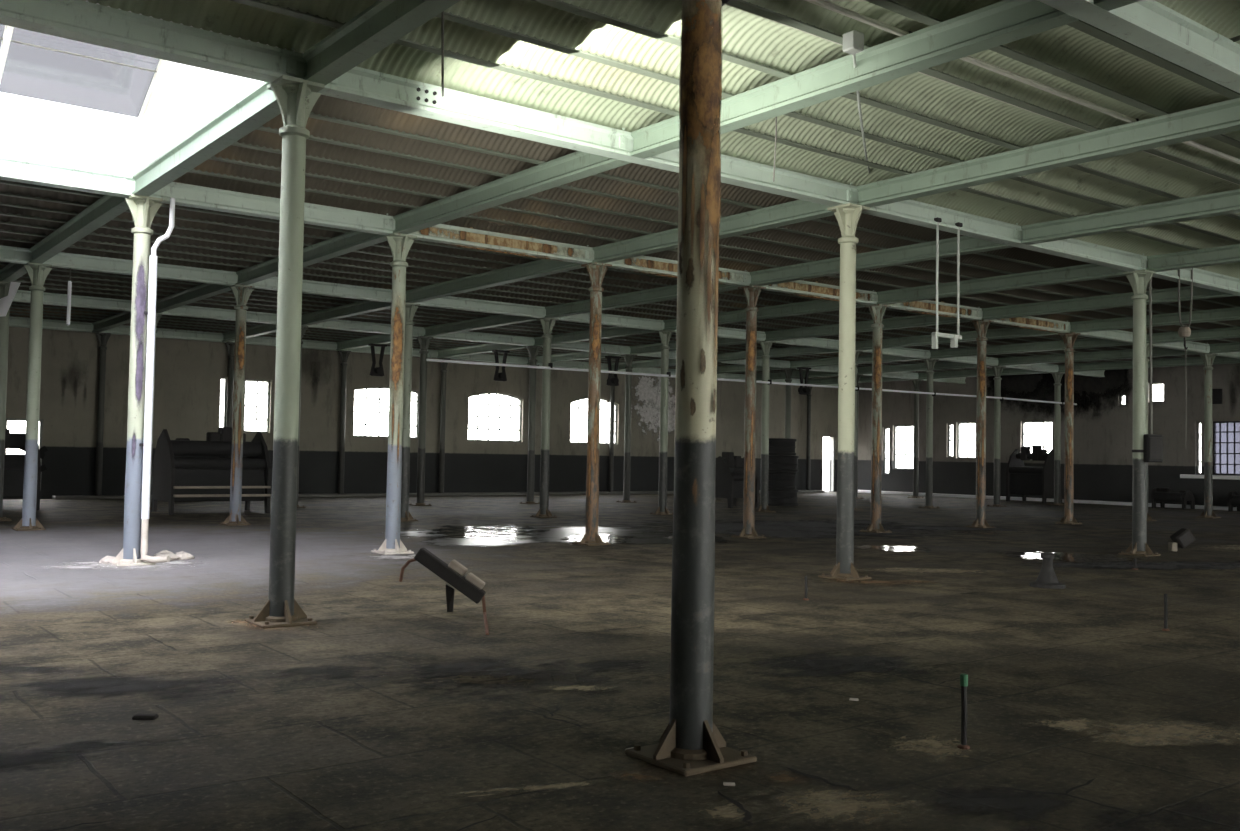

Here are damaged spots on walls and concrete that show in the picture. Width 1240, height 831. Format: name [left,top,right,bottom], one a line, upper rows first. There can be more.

rust [679,0,730,360]
rust [419,227,573,261]
rust [624,258,678,278]
rust [591,312,600,367]
rust [748,326,756,377]
rust [391,306,404,460]
rust [588,399,598,503]